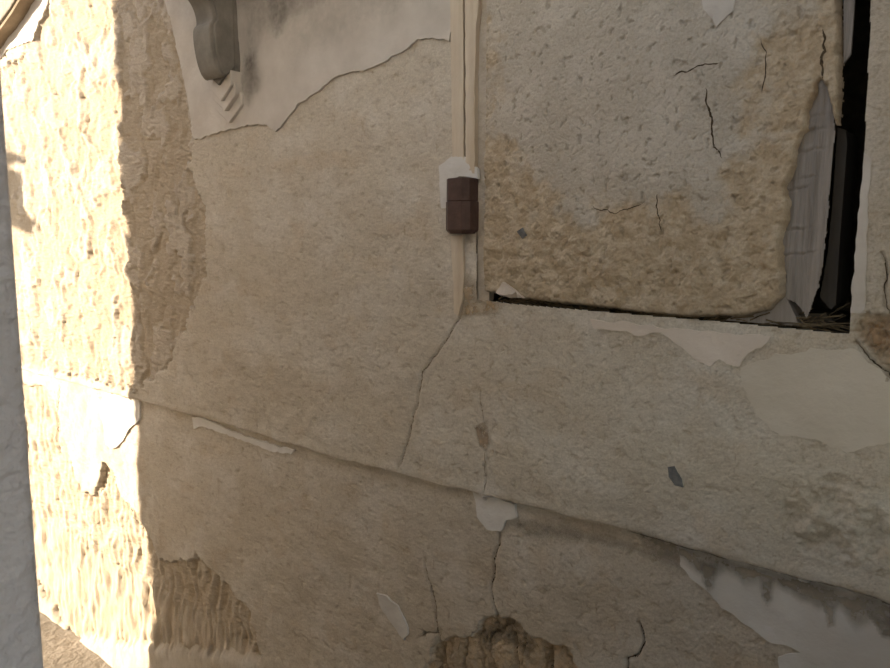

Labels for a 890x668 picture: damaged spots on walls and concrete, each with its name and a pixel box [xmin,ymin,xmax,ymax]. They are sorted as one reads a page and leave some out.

crack [673,63,718,76]
crack [819,31,827,79]
crack [705,89,722,158]
spalling [0,0,451,454]
peeling [496,282,525,298]
peeling [590,319,771,367]
crack [403,321,458,459]
spalling [668,466,684,487]
spalling [23,383,261,655]
peeling [473,492,518,531]
peeling [677,545,890,668]
spalling [427,614,578,668]